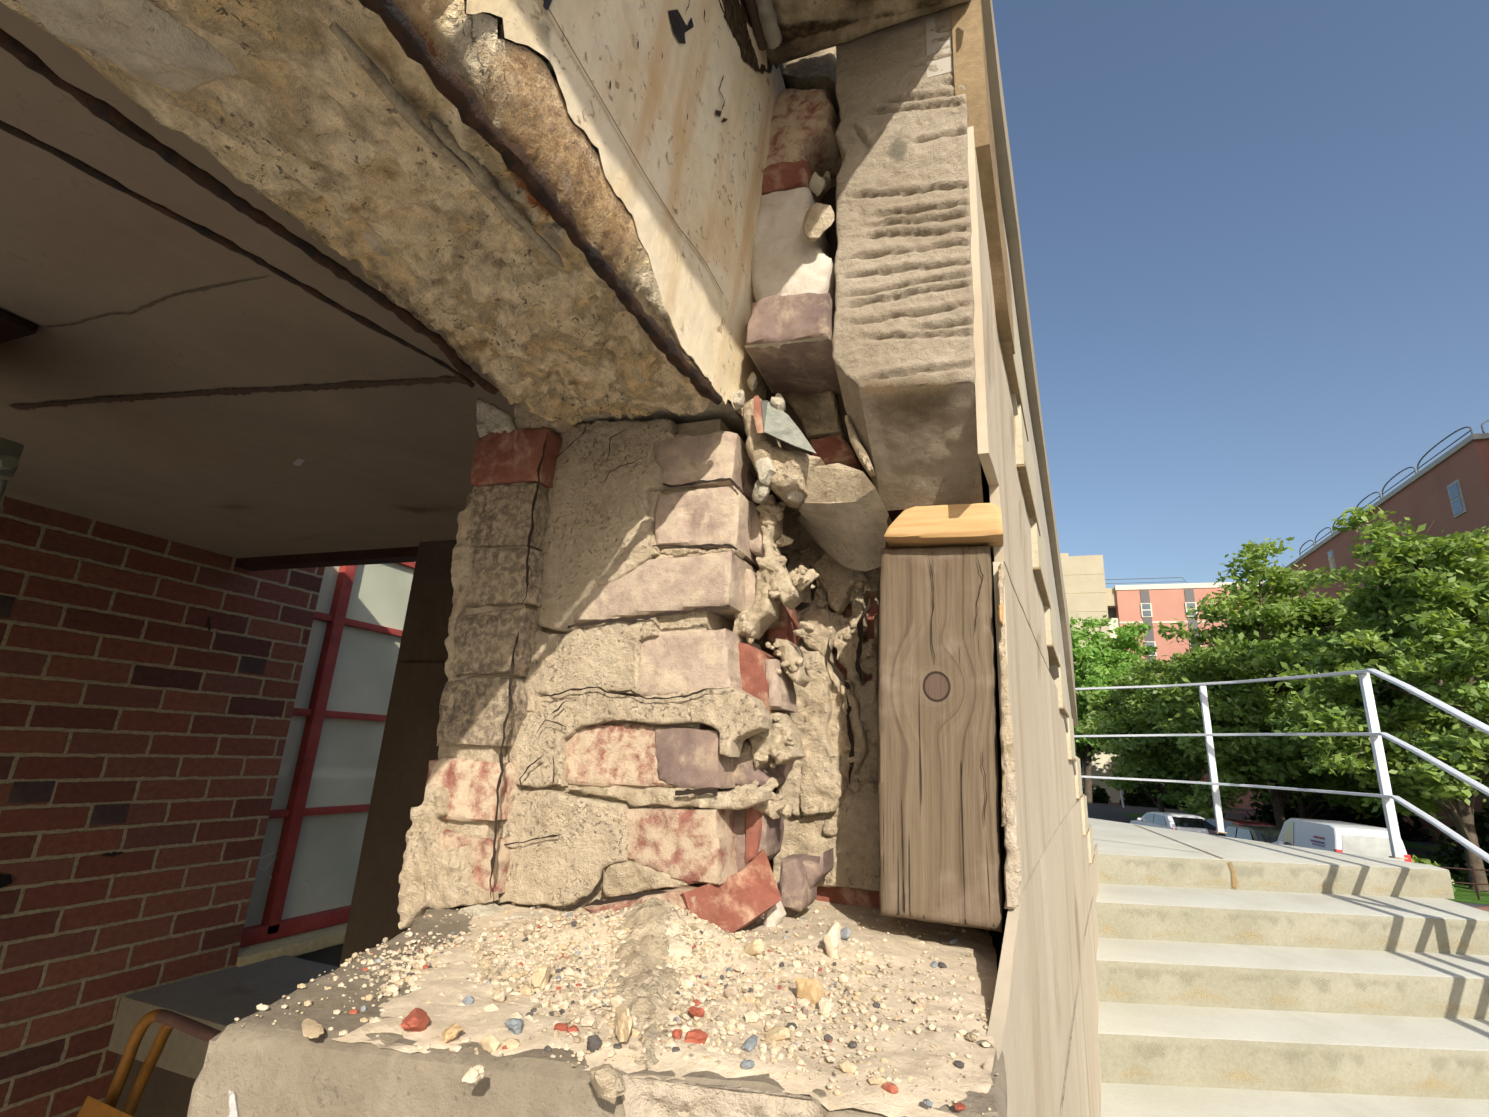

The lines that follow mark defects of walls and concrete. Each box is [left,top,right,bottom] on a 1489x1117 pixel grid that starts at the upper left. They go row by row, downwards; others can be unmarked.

spalling [0,0,729,425]
crack [41,276,269,327]
crack [489,426,740,897]
damp [229,1091,238,1117]
spalling [621,1076,824,1117]